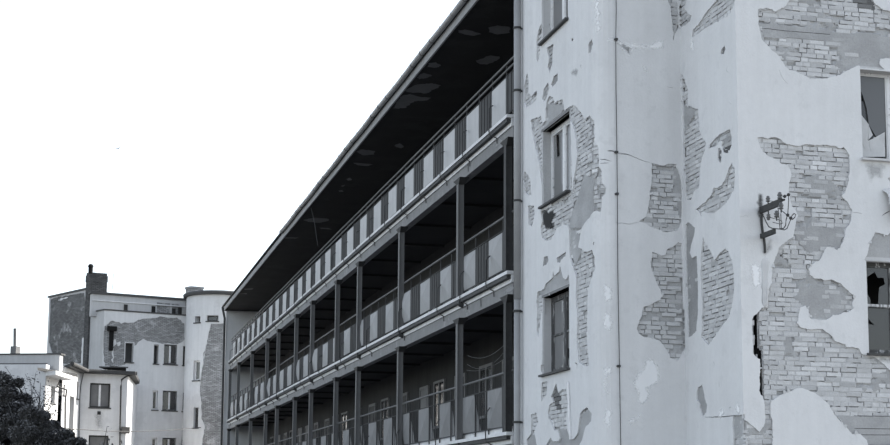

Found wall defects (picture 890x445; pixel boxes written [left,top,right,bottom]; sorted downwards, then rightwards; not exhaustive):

flaking render [668,0,735,38]
flaking render [758,0,890,79]
flaking render [525,26,608,366]
flaking render [633,77,735,361]
flaking render [103,302,185,366]
flaking render [200,323,223,445]
flaking render [528,381,592,445]
flaking render [734,137,890,445]